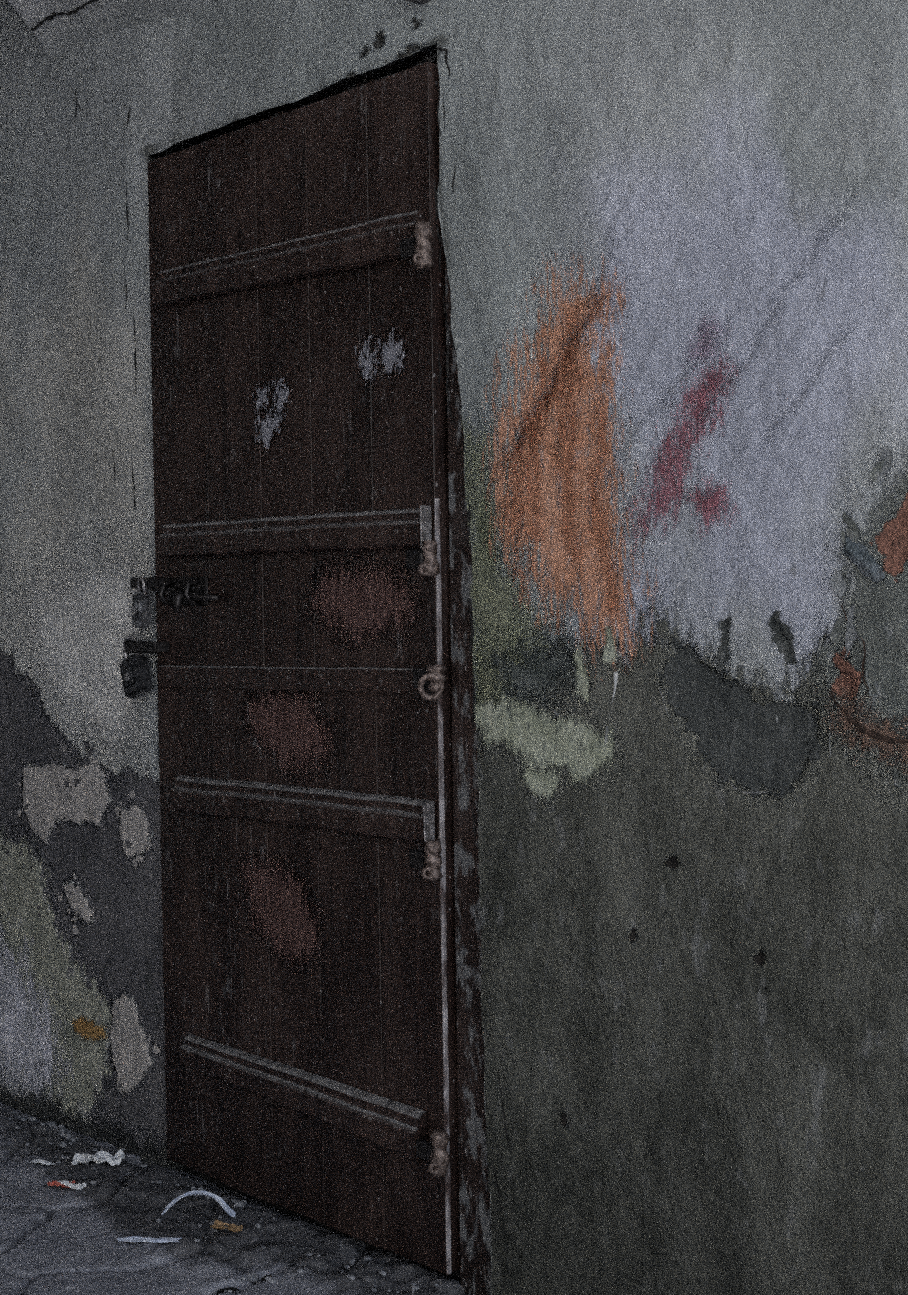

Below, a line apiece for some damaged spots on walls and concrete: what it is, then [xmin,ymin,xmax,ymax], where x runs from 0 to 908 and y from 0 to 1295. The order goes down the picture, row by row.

crack [31,0,98,31]
flaking render [0,650,170,1161]
flaking render [473,446,908,1295]